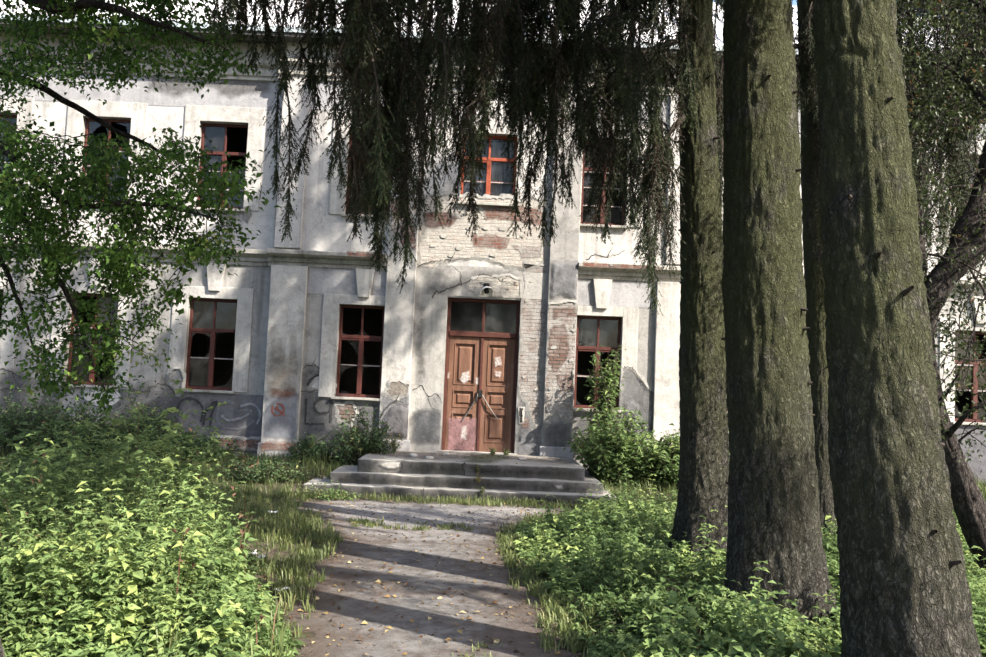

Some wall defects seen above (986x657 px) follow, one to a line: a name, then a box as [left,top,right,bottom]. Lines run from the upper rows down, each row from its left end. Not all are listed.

crack [417,252,517,298]
flaking render [389,191,577,455]
flaking render [382,379,410,400]
crack [380,385,442,417]
flaking render [619,368,653,451]